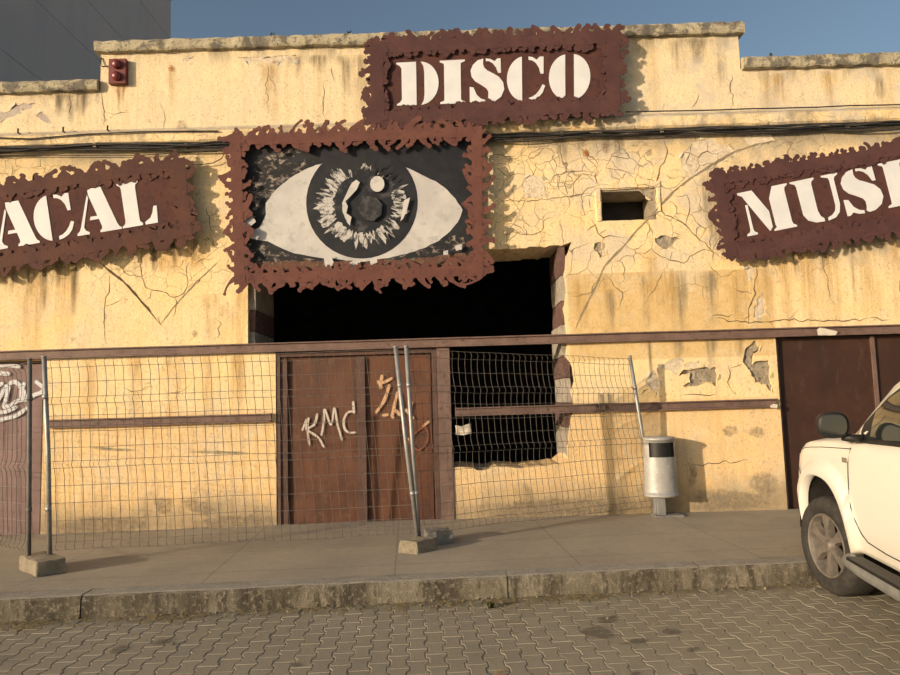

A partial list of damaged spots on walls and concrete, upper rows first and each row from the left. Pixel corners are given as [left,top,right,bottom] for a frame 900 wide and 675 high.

peeling [0,103,50,123]
crack [499,140,776,327]
crack [101,209,218,334]
crack [713,262,884,324]
spalling [645,358,721,392]
spalling [741,341,774,392]